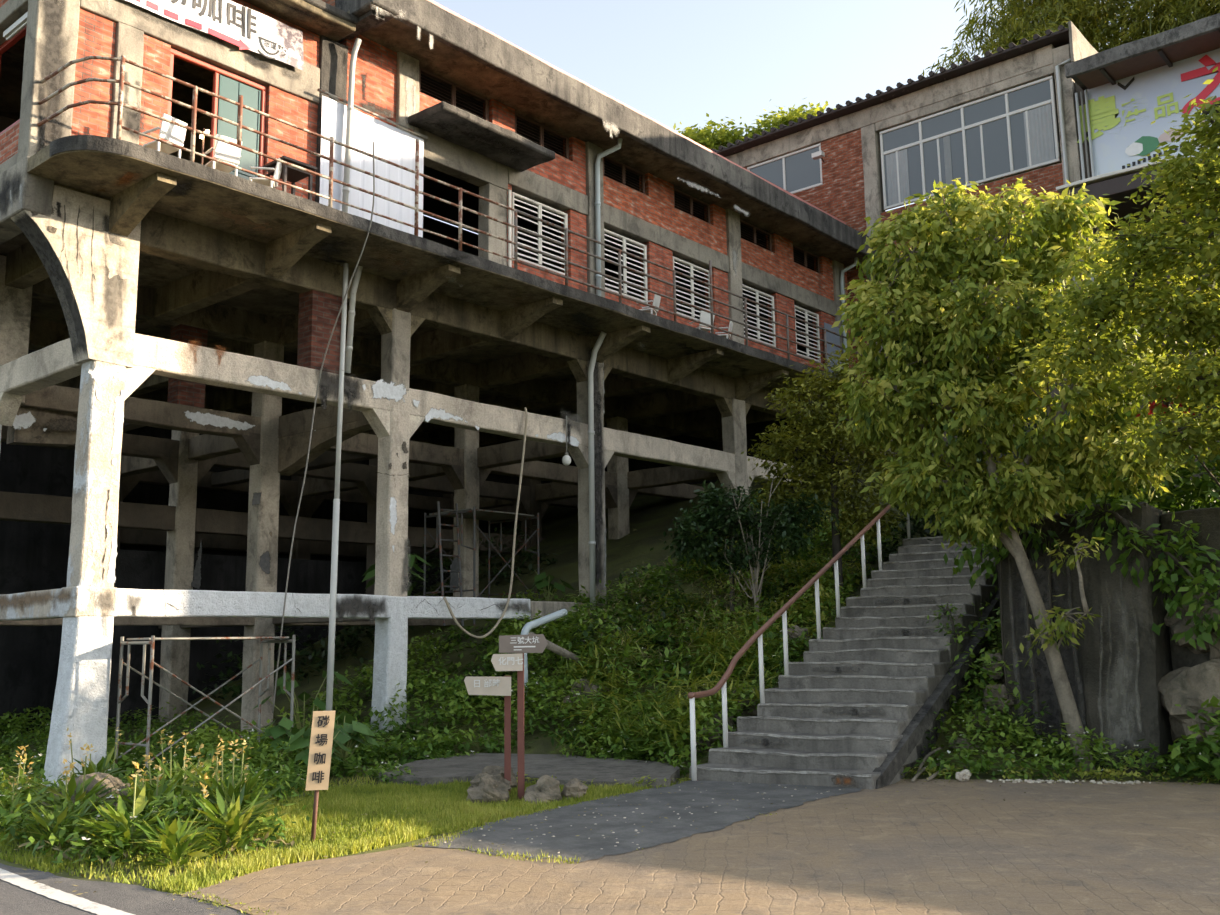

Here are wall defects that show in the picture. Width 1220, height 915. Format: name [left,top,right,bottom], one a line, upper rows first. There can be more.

damp [38,0,66,152]
peeling [89,366,124,465]
peeling [184,411,255,430]
peeling [247,375,302,395]
peeling [362,379,479,430]
peeling [106,525,117,583]
damp [100,593,112,636]
damp [129,597,141,616]